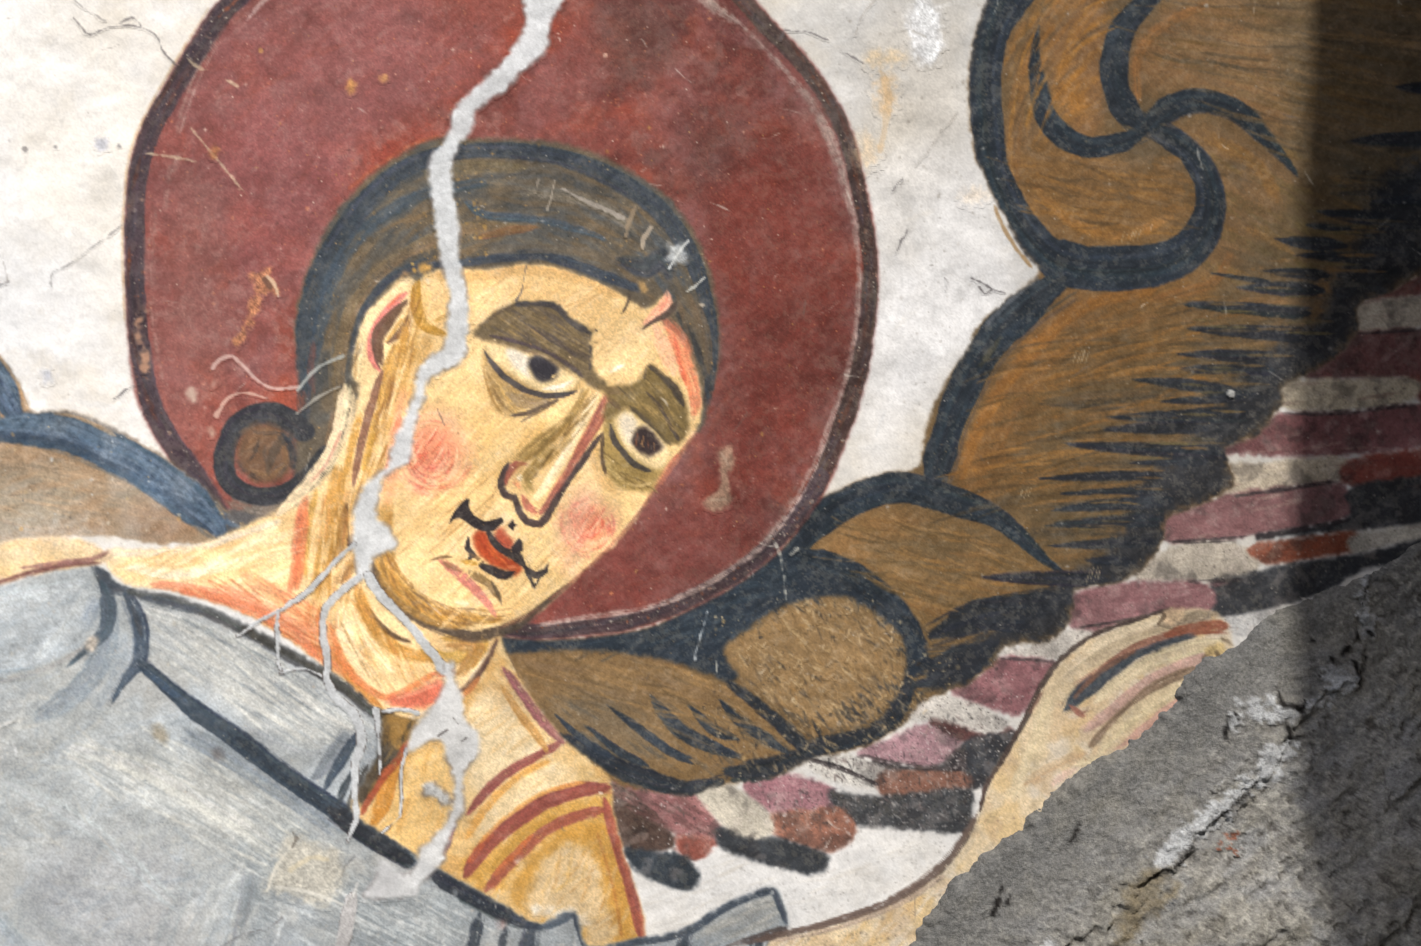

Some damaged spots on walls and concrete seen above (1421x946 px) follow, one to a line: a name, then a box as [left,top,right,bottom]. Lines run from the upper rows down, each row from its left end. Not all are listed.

crack [235,0,568,946]
peeling [1155,603,1187,628]
peeling [1199,639,1228,658]